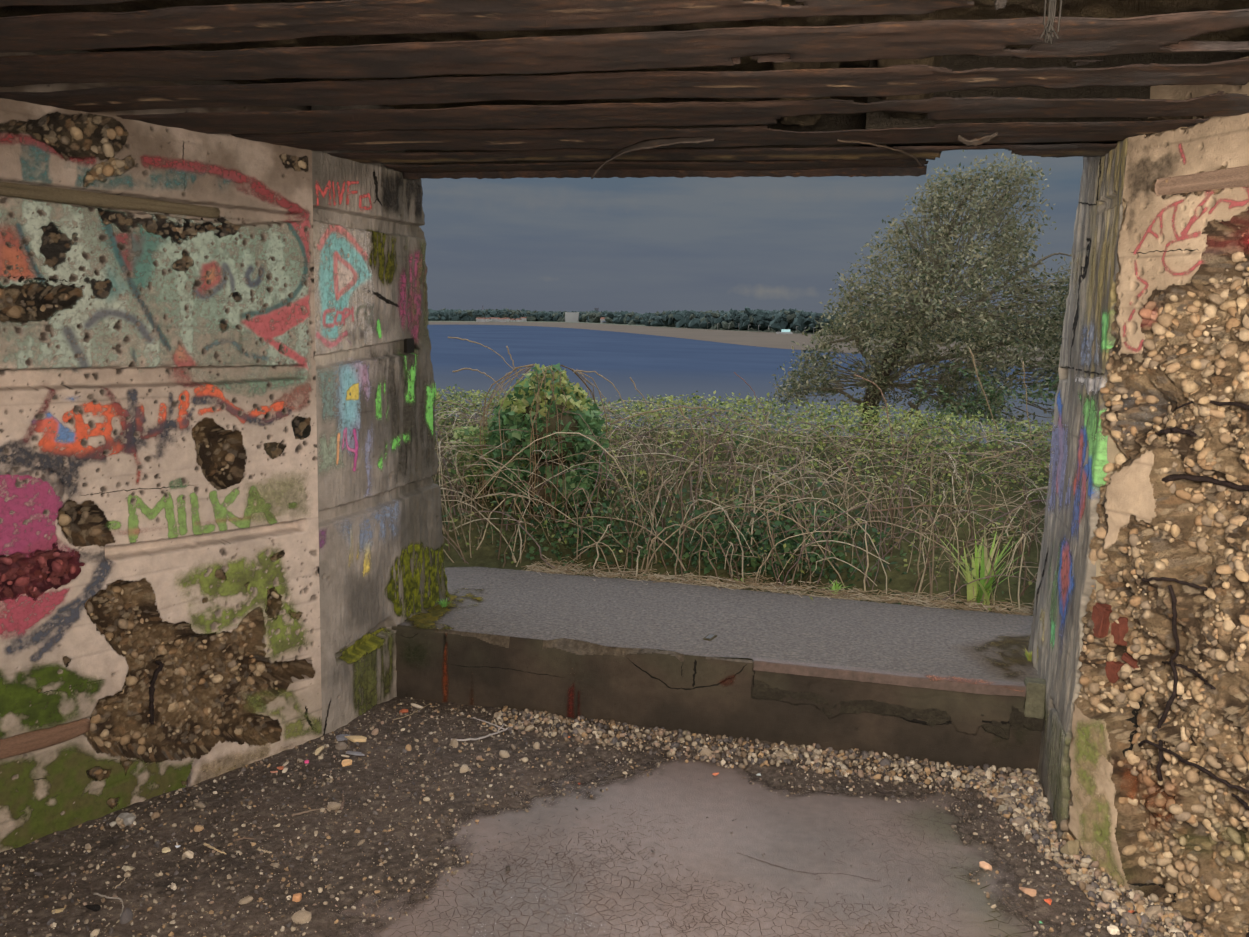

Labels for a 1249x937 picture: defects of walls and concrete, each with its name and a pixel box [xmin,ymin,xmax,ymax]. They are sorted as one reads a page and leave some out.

spalling [0,112,135,187]
spalling [1150,179,1232,199]
spalling [0,222,113,323]
spalling [192,417,247,490]
spalling [0,500,116,601]
spalling [1074,207,1249,937]
spalling [83,578,315,781]
crack [626,657,755,690]
crack [350,799,1049,937]
spalling [1060,792,1085,854]